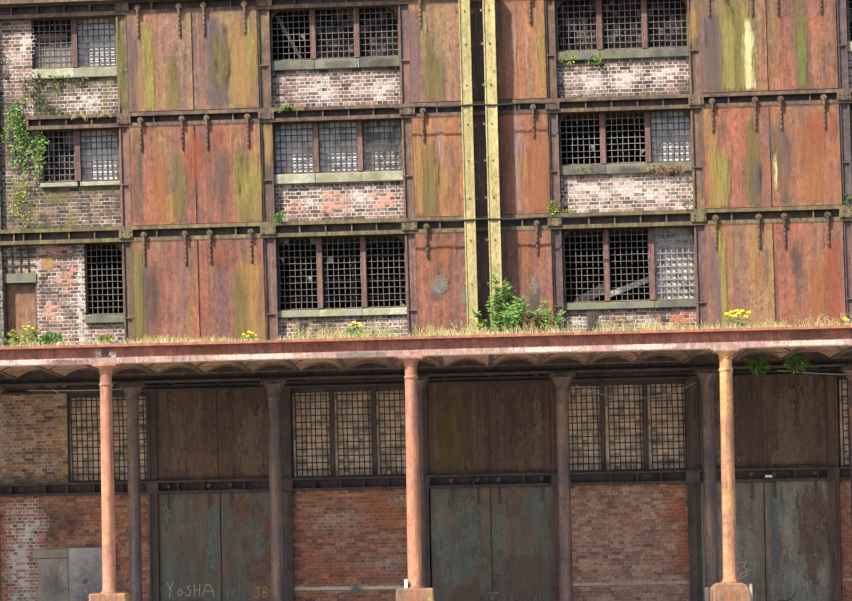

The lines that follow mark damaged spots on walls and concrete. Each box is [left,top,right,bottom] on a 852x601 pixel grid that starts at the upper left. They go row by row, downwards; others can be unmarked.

water stain [139,28,155,109]
corrosion [536,26,545,97]
water stain [699,2,756,90]
water stain [793,7,808,87]
corrosion [414,133,454,214]
corrosion [233,260,266,341]
peeling [202,496,271,581]